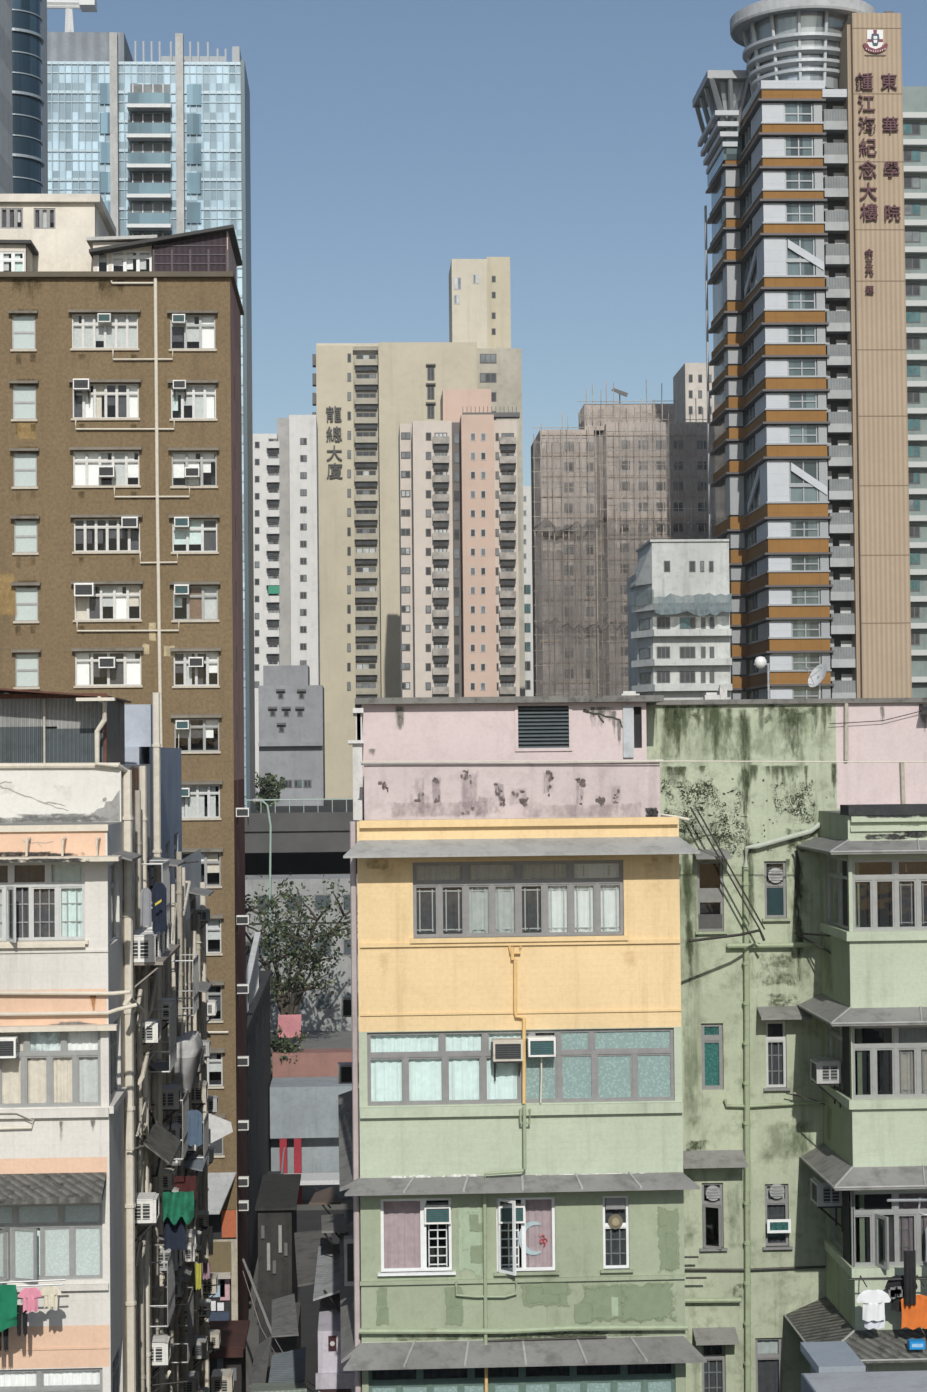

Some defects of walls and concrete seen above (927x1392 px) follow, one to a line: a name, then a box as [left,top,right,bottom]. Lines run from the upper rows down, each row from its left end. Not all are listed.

water stain [654,705,831,808]
crack [0,781,68,811]
peeling [494,783,529,807]
peeling [576,778,620,807]